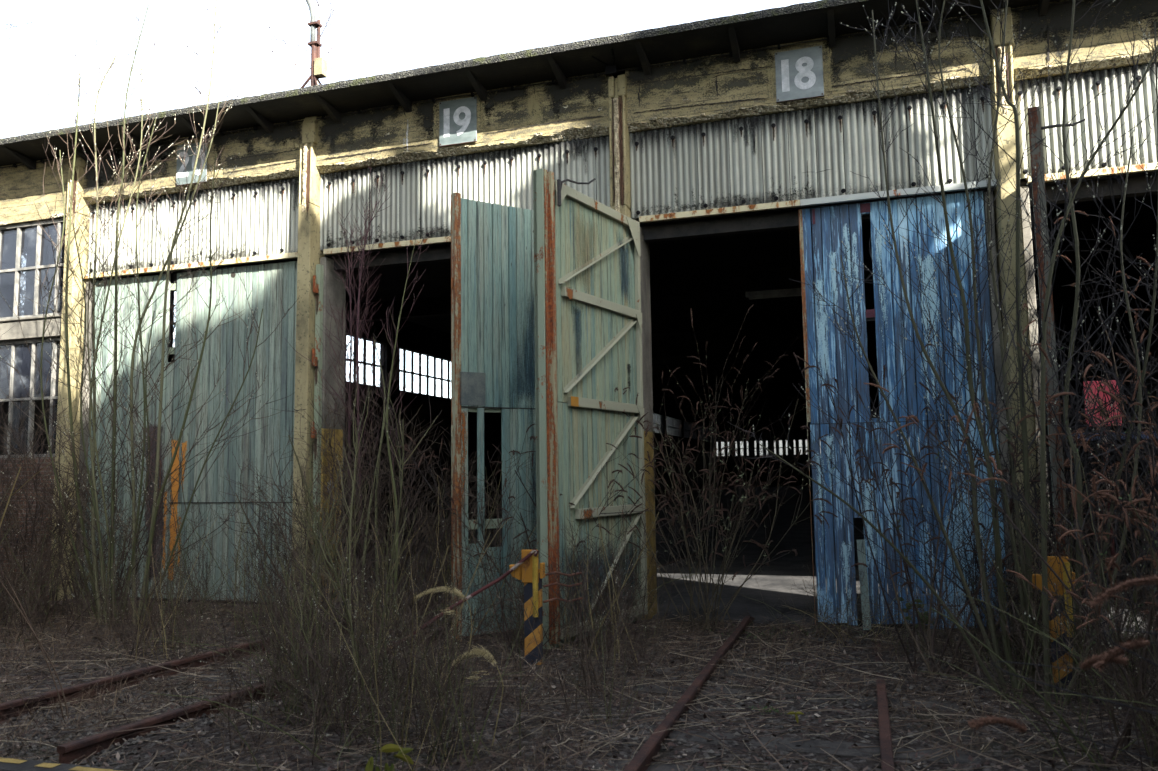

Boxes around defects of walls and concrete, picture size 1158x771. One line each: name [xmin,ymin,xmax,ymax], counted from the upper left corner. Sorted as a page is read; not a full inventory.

damp [83,119,302,213]
damp [319,72,609,195]
damp [624,47,774,99]
damp [635,175,815,217]
damp [630,86,989,154]
damp [823,13,991,91]
peeling [814,223,862,384]
peeling [875,229,889,353]
peeling [916,254,940,407]